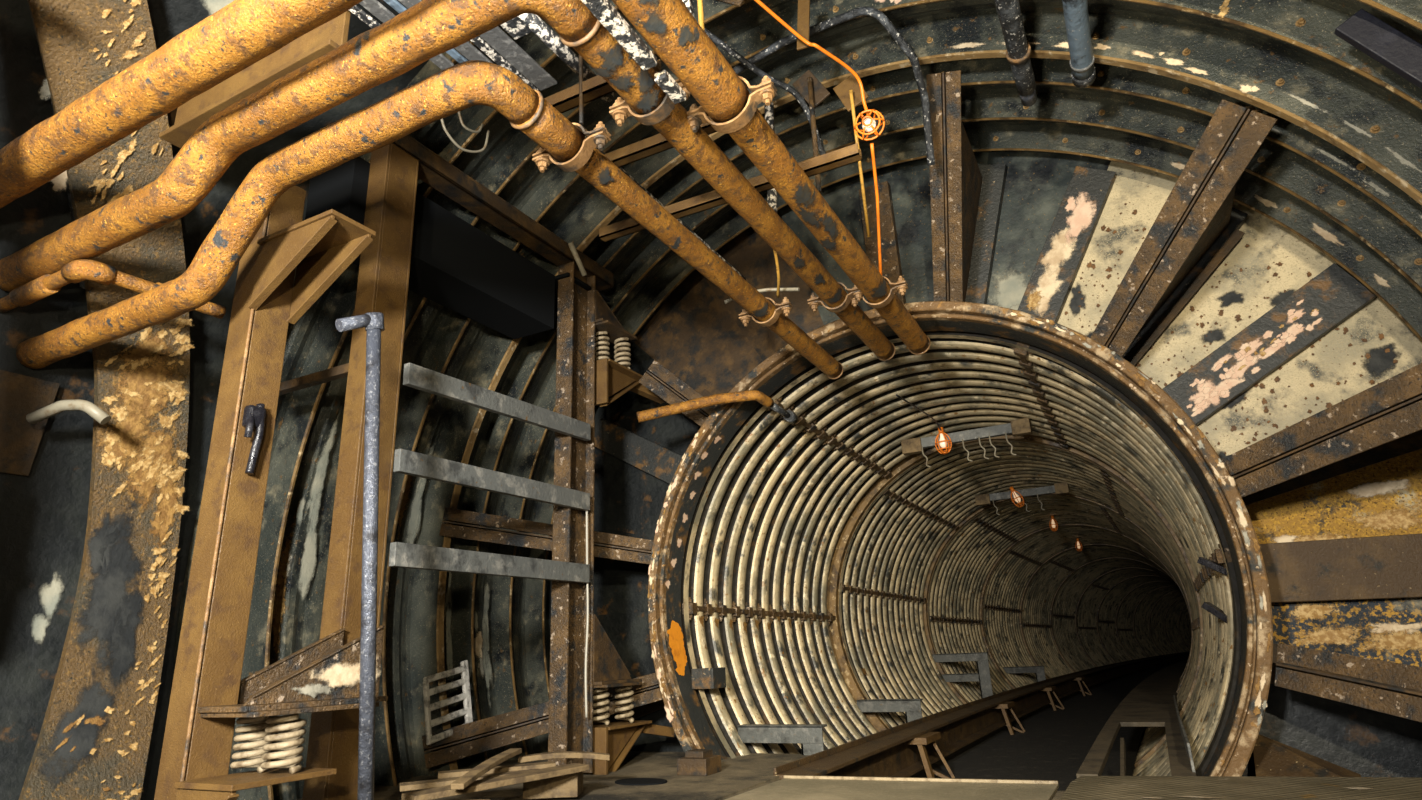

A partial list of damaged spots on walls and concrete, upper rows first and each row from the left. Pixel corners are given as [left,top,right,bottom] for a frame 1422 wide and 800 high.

peeling [1010,193,1160,395]
peeling [1173,299,1323,568]
peeling [1347,479,1408,498]
leakage [40,490,144,784]
peeling [1259,592,1271,651]
peeling [1371,623,1422,634]
peeling [1253,673,1267,726]